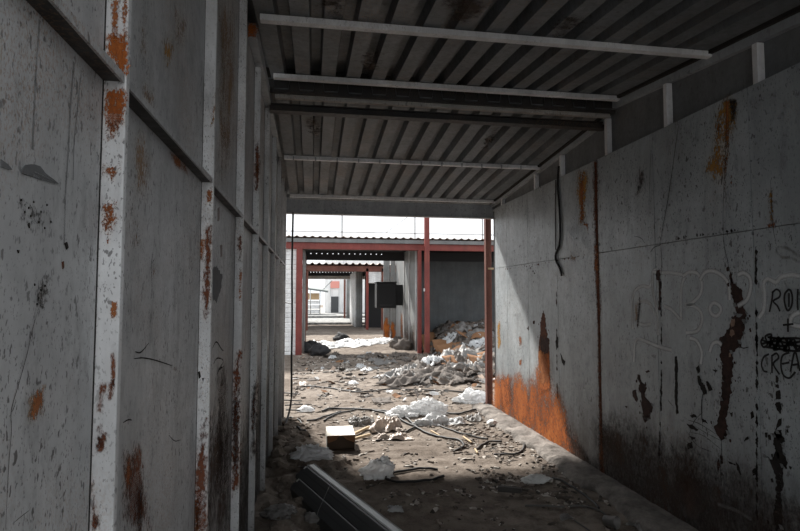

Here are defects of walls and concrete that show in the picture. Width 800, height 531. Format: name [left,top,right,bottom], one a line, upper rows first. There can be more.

corrosion [106,0,130,75]
corrosion [103,88,128,142]
corrosion [99,200,117,244]
corrosion [200,225,212,319]
corrosion [492,161,605,474]
corrosion [96,427,107,452]
corrosion [98,354,115,412]
corrosion [122,446,150,531]
corrosion [194,344,279,531]
peeling [632,356,679,460]
peeling [687,247,759,484]
peeling [744,375,792,530]